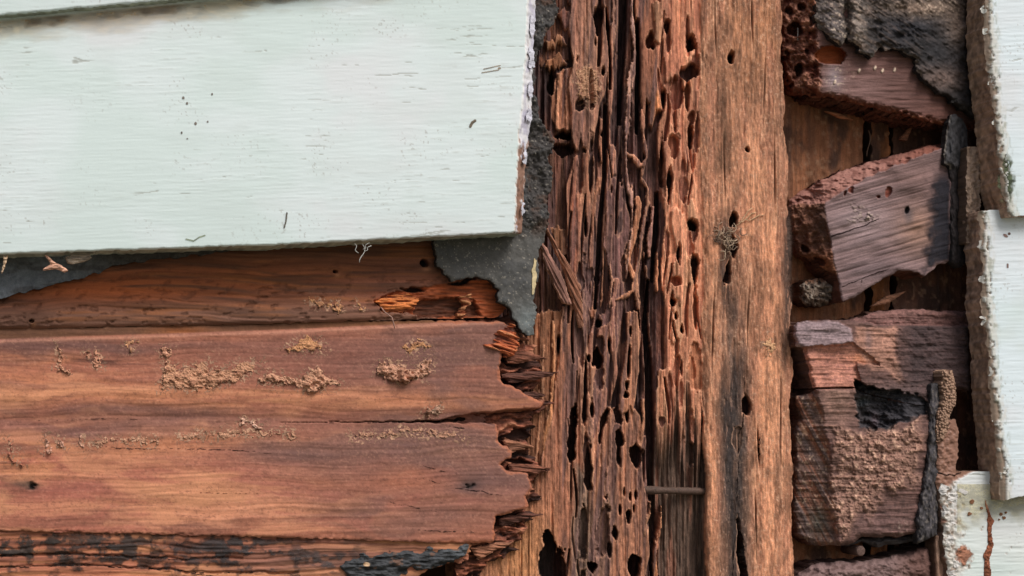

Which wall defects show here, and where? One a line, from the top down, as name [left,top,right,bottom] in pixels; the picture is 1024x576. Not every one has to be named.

crack [285,417,465,429]
corrosion [956,499,1007,576]